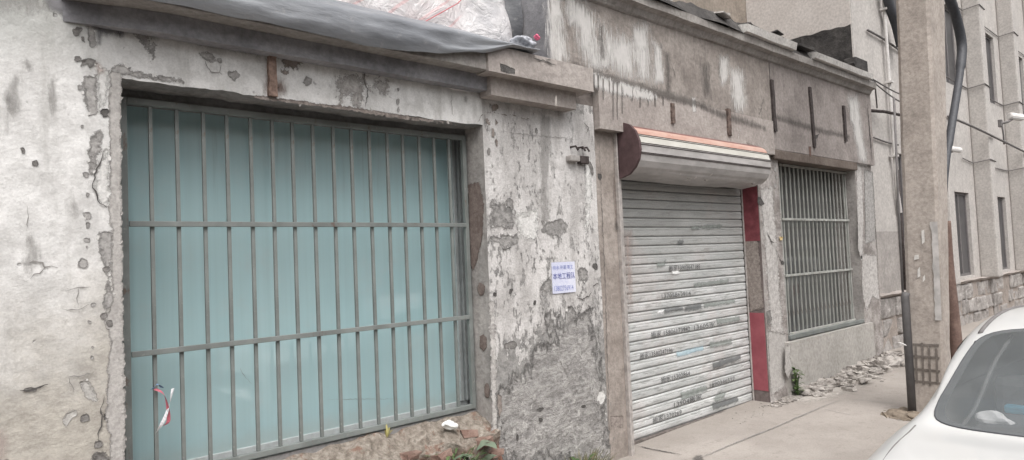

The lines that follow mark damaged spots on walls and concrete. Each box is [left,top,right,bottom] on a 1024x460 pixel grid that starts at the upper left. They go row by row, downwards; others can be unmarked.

spalling [201,52,240,81]
damp [545,0,747,119]
spalling [254,73,465,127]
crack [92,151,107,208]
peeling [72,26,185,460]
spalling [468,182,569,271]
crack [29,260,93,310]
spalling [540,278,552,293]
spalling [577,267,589,283]
spalling [284,299,615,460]